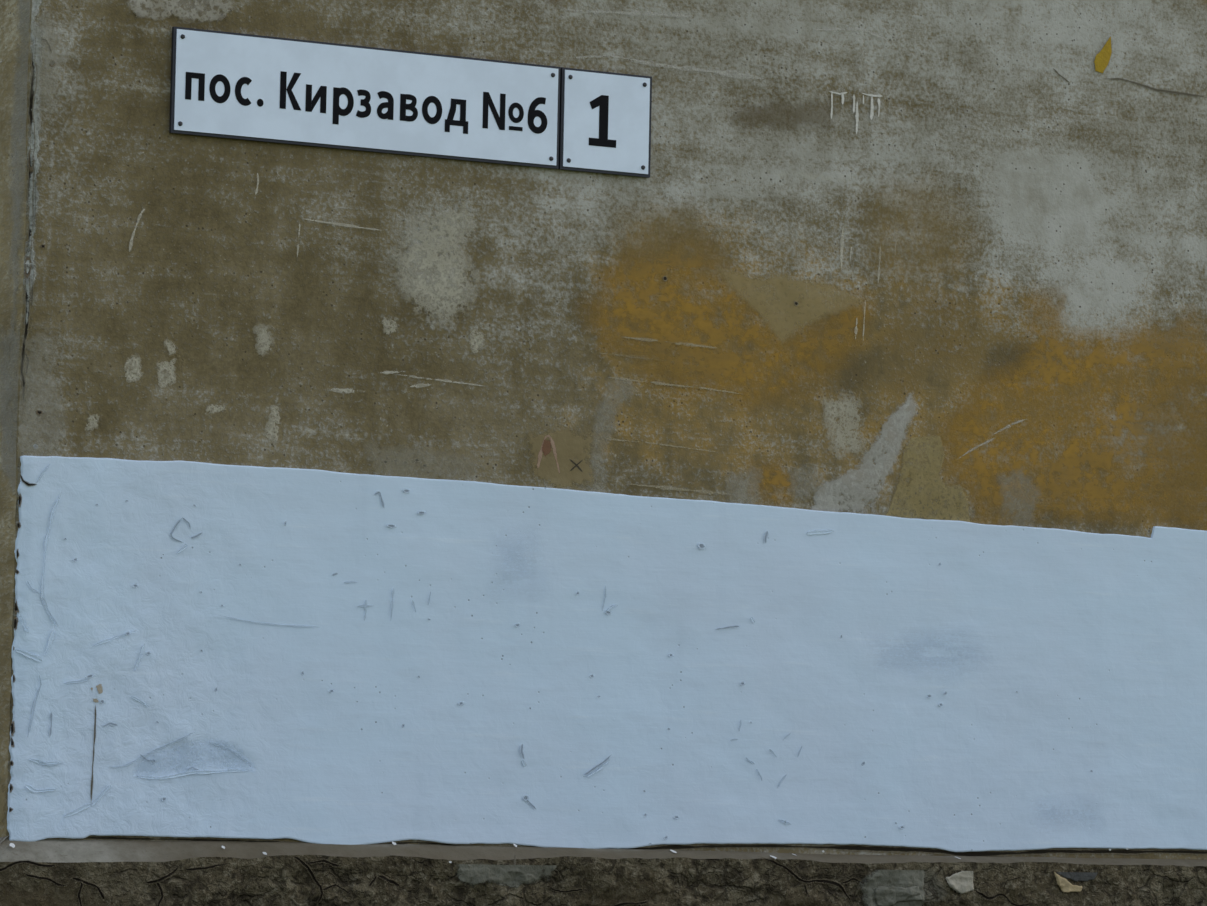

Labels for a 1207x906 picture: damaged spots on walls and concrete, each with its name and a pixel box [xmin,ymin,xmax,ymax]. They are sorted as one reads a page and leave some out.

flaking render [825,399,862,451]